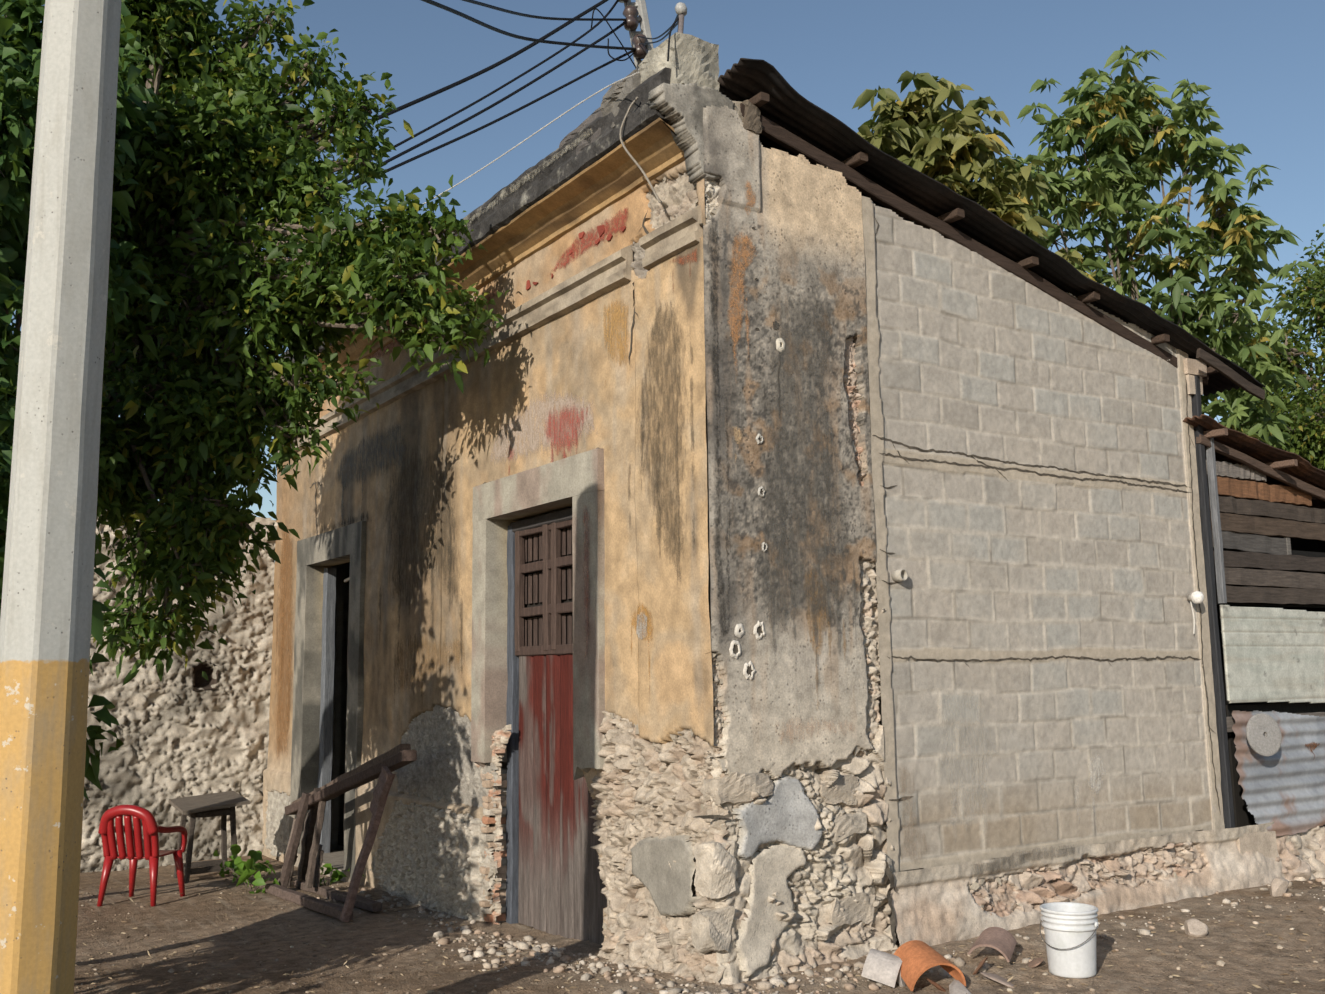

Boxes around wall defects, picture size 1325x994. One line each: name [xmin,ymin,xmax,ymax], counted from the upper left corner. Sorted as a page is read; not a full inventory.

damp [325,425,455,604]
damp [715,427,741,636]
damp [711,221,752,409]
damp [761,304,855,634]
spalling [843,337,866,486]
crack [873,376,1221,815]
spalling [370,705,511,925]
spalling [590,558,899,985]
spalling [967,842,1208,917]